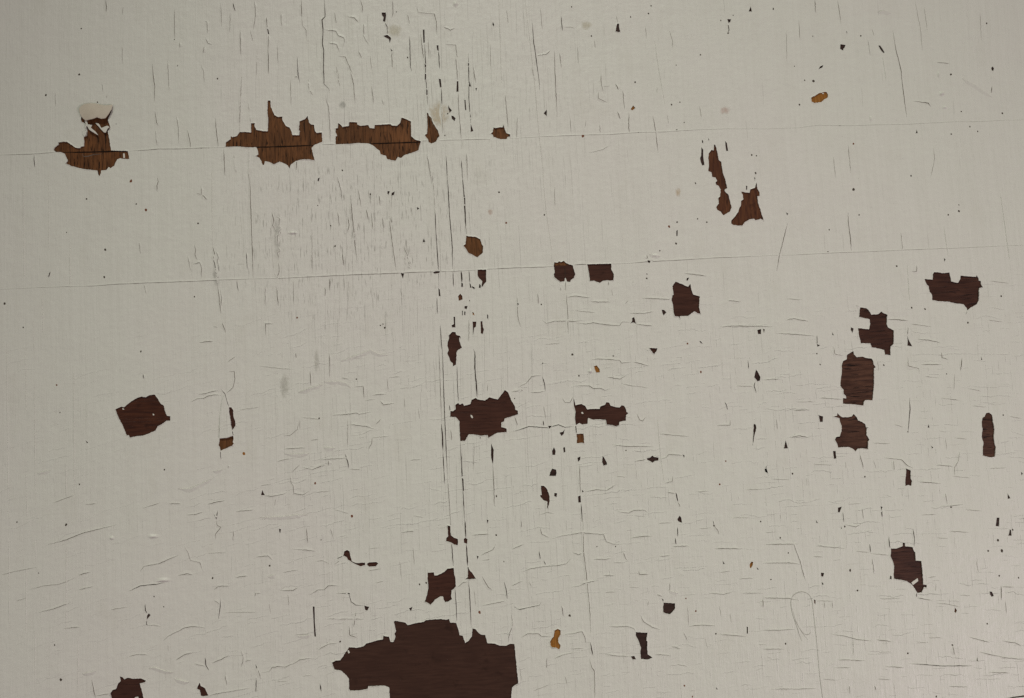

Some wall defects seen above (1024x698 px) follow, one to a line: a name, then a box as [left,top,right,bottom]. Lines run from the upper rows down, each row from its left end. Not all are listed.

peeling [225,100,446,169]
crack [504,0,1024,177]
peeling [114,393,171,439]
crack [0,0,708,698]
peeling [449,389,519,465]
crack [515,212,1022,345]
peeling [818,306,913,460]
crack [746,395,1006,546]
peeling [911,257,984,324]
peeling [331,555,520,698]
crack [656,514,891,667]
crack [772,633,1024,698]